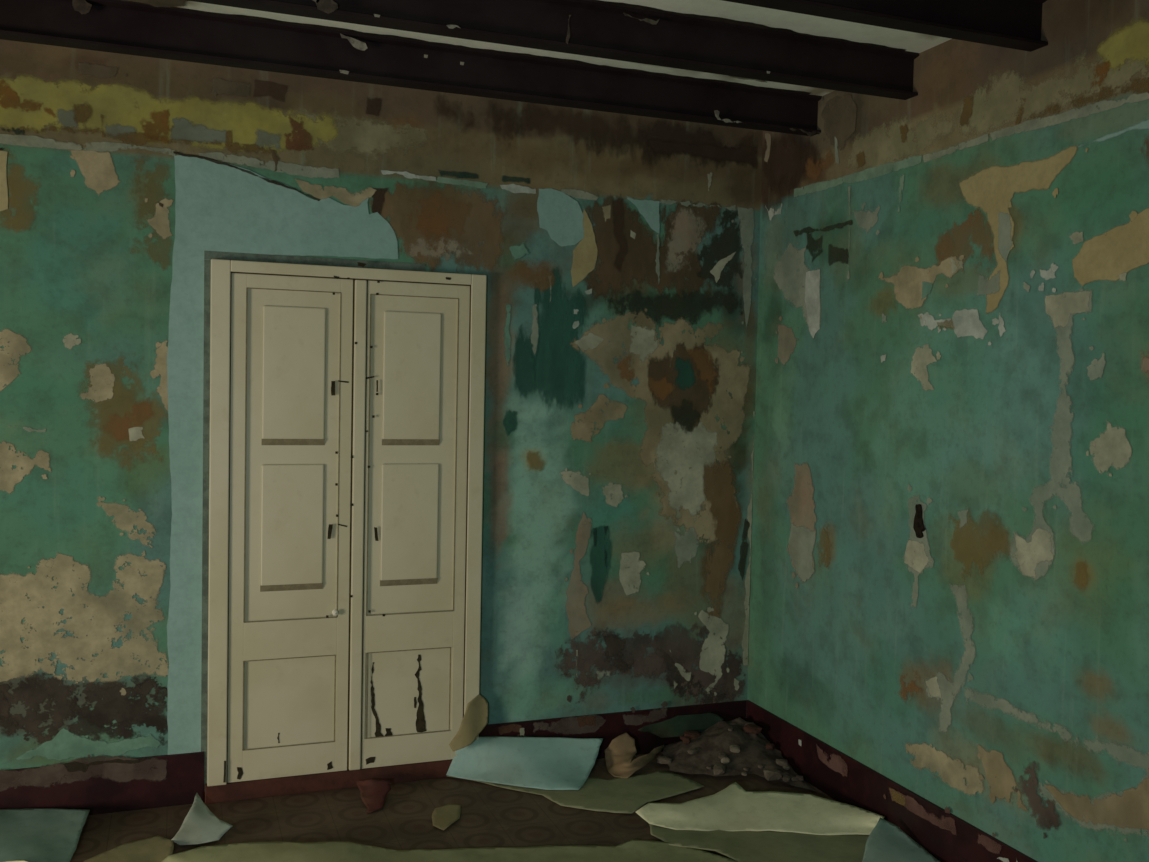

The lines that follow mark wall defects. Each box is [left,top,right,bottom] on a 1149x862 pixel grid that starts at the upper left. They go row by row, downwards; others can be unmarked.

peeling [879,146,1089,391]
peeling [1023,208,1149,293]
peeling [0,441,51,493]
corrosion [87,359,164,464]
spalling [560,308,750,568]
peeling [0,496,168,695]
water stain [0,673,168,745]
water stain [559,461,745,704]
spalling [670,607,739,696]
spalling [904,484,934,607]
water stain [925,585,1149,841]
peeling [905,743,1028,812]